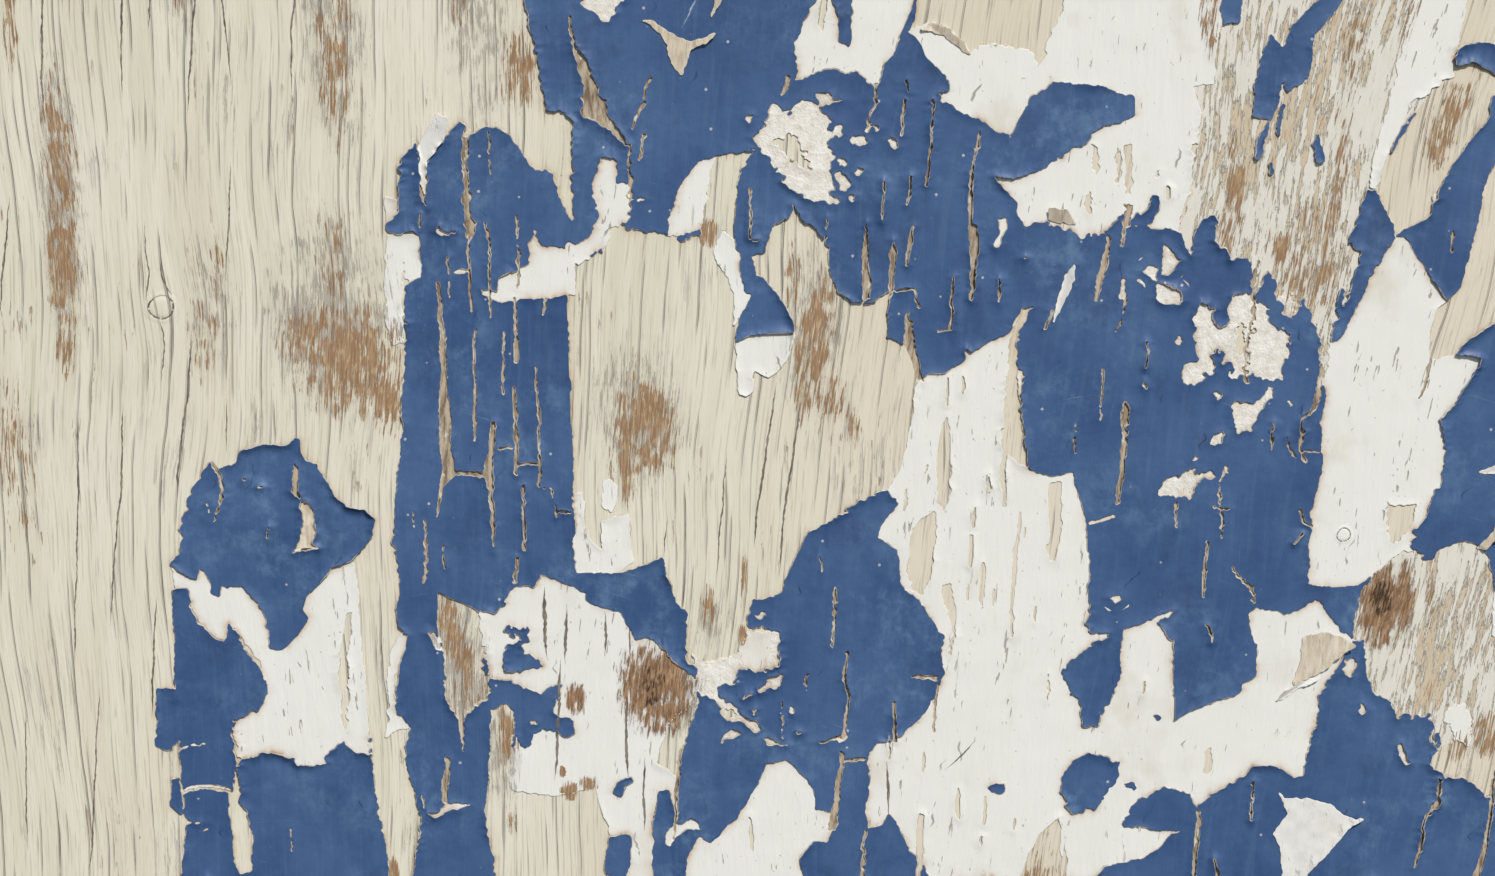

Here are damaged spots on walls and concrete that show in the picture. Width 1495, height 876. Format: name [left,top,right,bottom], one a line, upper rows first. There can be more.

peeling [0,0,574,876]
peeling [429,0,1495,876]